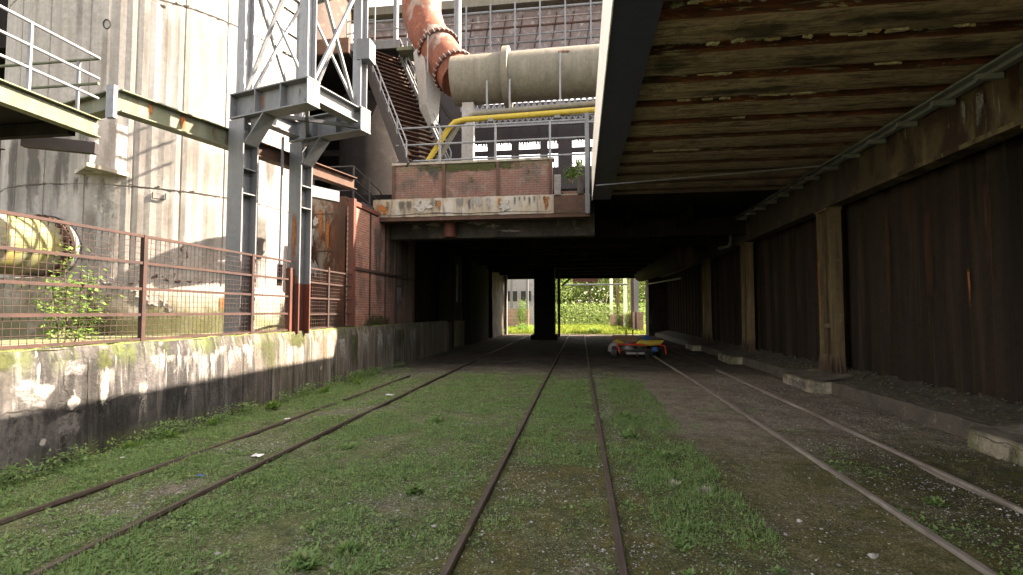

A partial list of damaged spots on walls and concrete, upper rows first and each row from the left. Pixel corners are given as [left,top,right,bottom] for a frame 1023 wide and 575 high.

peeling [664,34,813,46]
peeling [830,23,977,36]
damp [7,143,16,211]
damp [27,148,39,202]
damp [55,152,104,200]
corrosion [311,210,330,254]
spalling [65,360,85,376]
peeling [100,368,109,404]
damp [152,342,275,376]
damp [287,345,297,367]
damp [313,329,425,371]